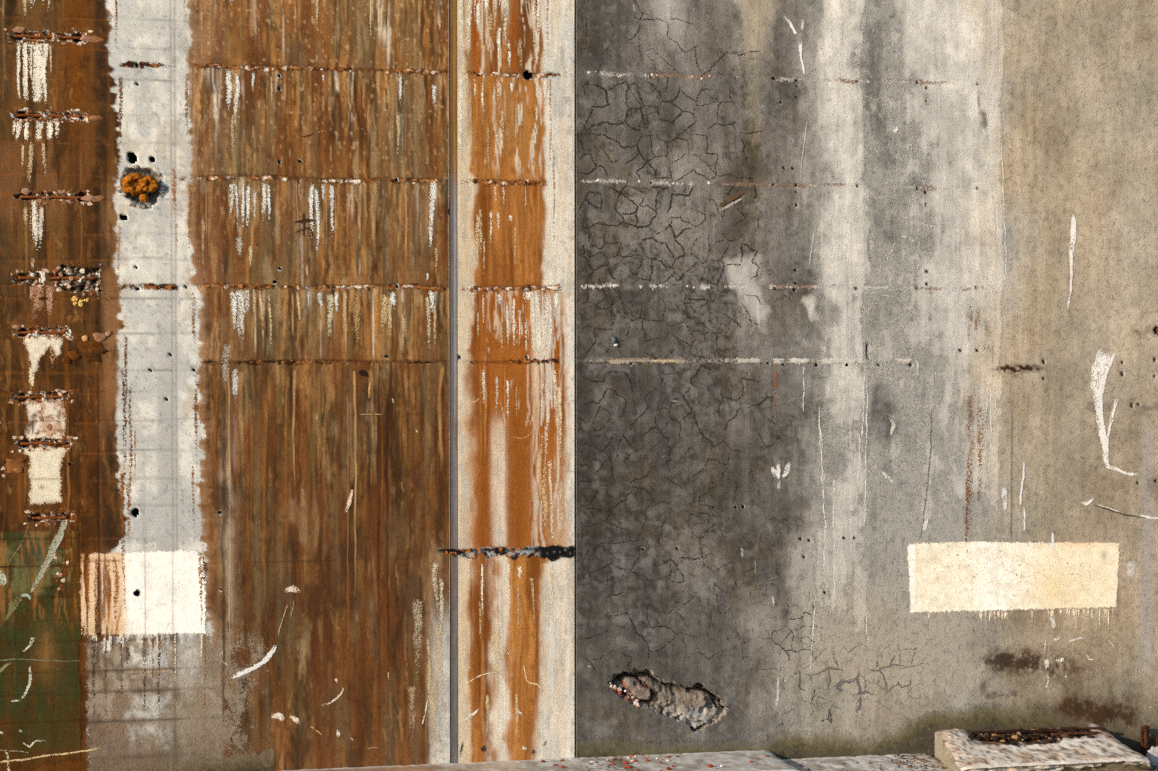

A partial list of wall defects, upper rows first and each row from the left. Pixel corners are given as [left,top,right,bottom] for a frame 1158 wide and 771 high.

efflorescence [17,42,52,102]
efflorescence [12,120,60,184]
water stain [458,78,518,167]
efflorescence [23,200,44,267]
water stain [474,187,517,274]
efflorescence [18,285,67,505]
rust [0,0,151,771]
rust [172,0,574,771]
crack [97,0,932,728]
water stain [477,291,560,356]
water stain [534,0,1006,745]
spalling [608,669,738,732]